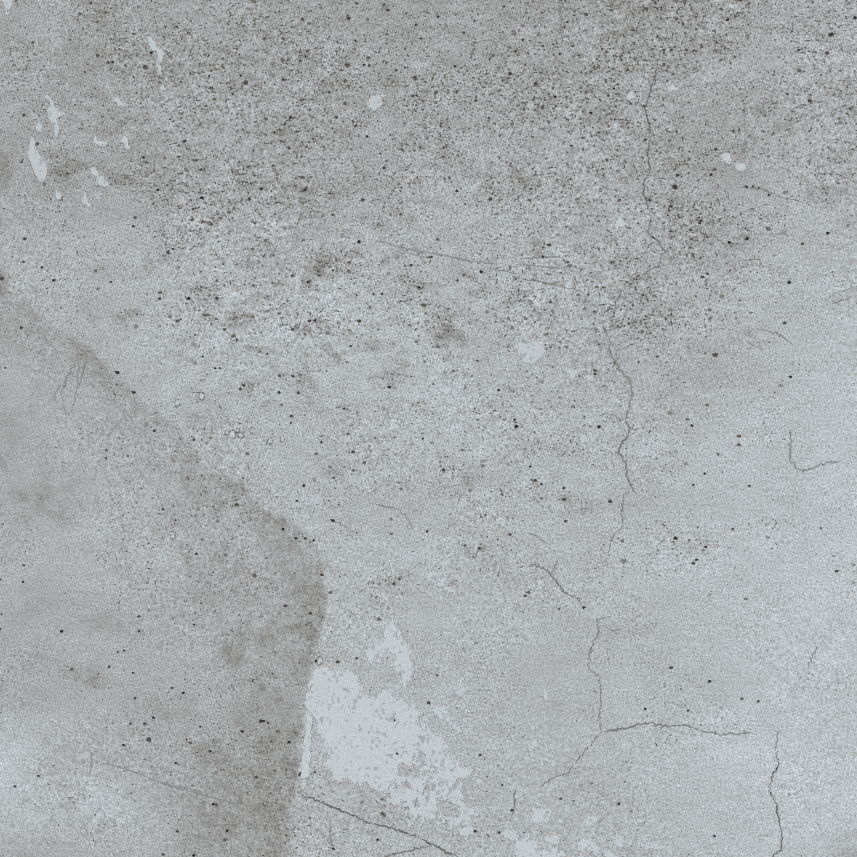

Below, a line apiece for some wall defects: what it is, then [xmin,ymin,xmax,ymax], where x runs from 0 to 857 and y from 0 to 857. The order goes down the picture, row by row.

peeling [138,35,168,92]
water stain [0,145,18,198]
peeling [28,95,66,182]
peeling [76,167,110,207]
crack [599,22,677,552]
crack [788,435,839,472]
water stain [0,261,331,857]
crack [529,533,581,604]
peeling [301,620,482,841]
crack [540,616,750,787]
crack [302,795,458,857]
crack [768,731,783,857]